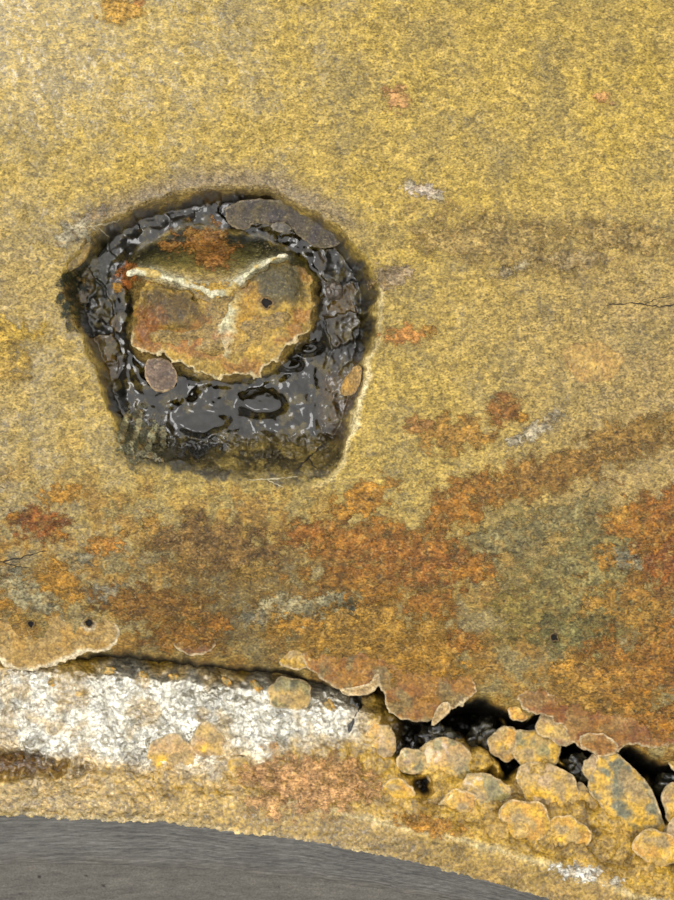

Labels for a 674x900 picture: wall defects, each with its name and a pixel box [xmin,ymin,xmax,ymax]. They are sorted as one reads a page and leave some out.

leakage [48,202,113,249]
peeling [225,198,340,248]
peeling [67,242,91,271]
corrosion [112,262,141,294]
corrosion [157,215,243,298]
peeling [130,260,315,393]
corrosion [377,321,437,347]
peeling [340,365,362,396]
leakage [112,404,167,474]
corrosion [402,391,530,458]
corrosion [0,406,674,900]